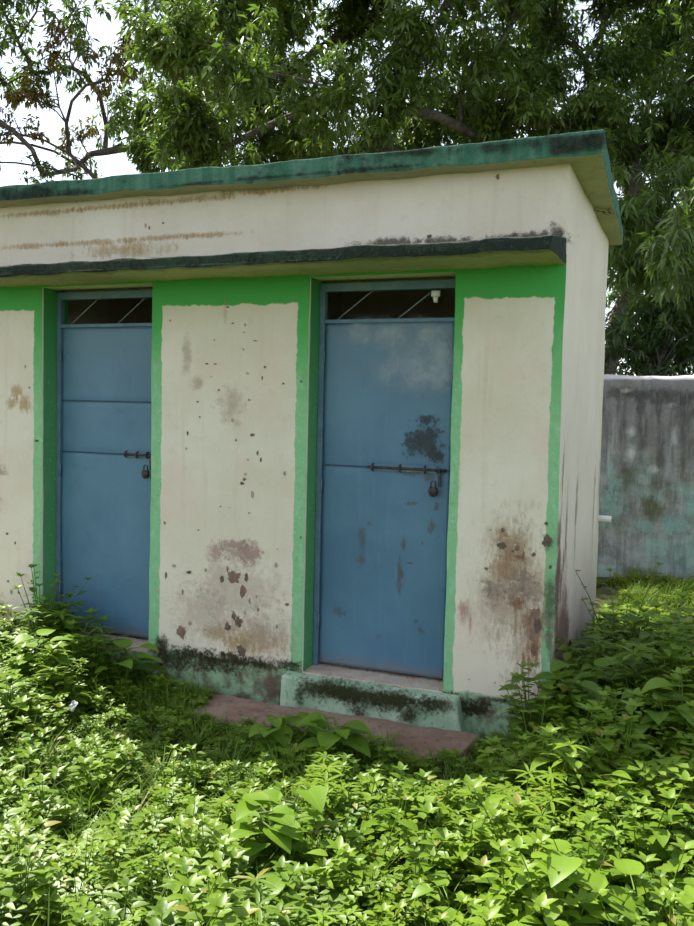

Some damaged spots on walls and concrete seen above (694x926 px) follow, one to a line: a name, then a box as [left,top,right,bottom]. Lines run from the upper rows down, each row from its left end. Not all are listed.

leakage [316,148,437,174]
mould [529,132,606,154]
leakage [0,224,569,275]
leakage [606,388,694,472]